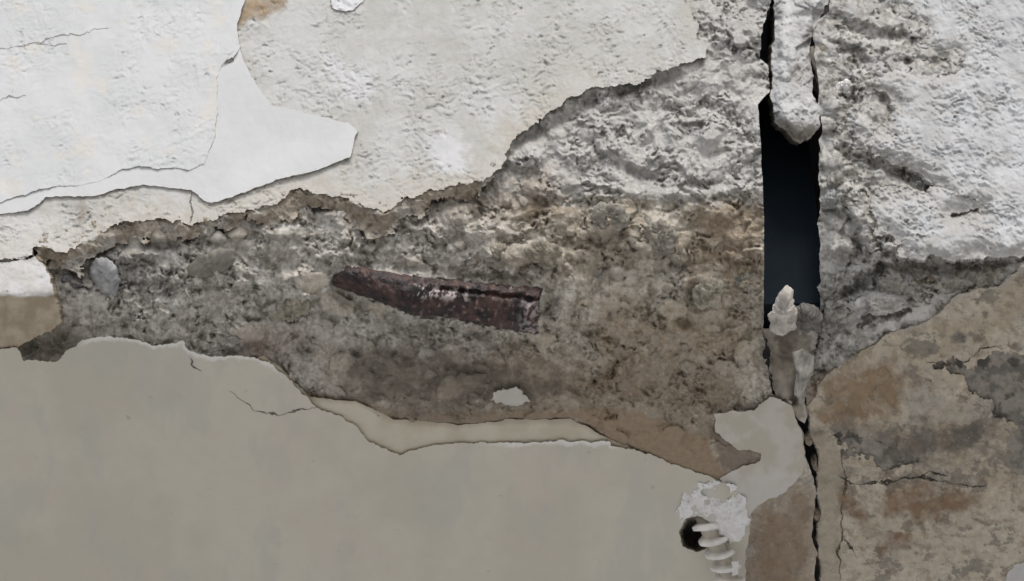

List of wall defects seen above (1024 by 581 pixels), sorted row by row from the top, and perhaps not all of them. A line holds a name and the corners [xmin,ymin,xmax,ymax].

spalling [4,0,792,481]
crack [763,335,773,387]
crack [230,391,317,416]
peeling [933,350,1024,474]
peeling [833,430,919,471]
spalling [731,417,818,581]
crack [836,434,984,578]
spalling [679,516,707,552]
peeling [1005,562,1024,581]